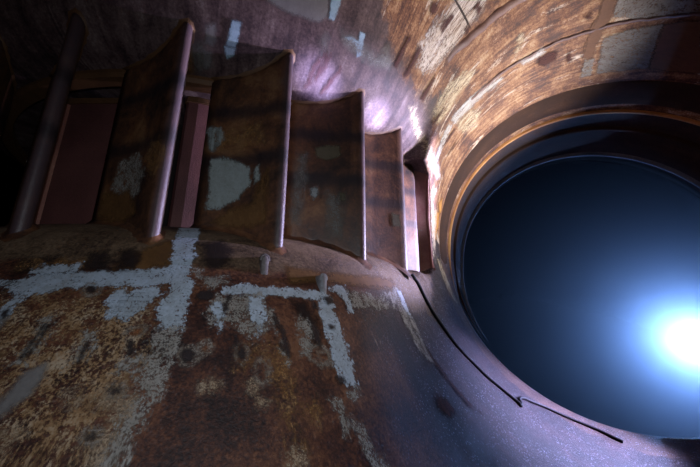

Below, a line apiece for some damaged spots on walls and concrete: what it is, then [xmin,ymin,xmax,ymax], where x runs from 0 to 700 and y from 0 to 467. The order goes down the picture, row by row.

corrosion [395,36,422,77]
corrosion [538,52,558,67]
corrosion [581,0,618,77]
peeling [597,0,700,74]
peeling [111,152,145,198]
peeling [206,127,260,210]
corrosion [112,240,176,271]
corrosion [285,266,396,289]
corrosion [0,286,159,467]
peeling [0,228,433,467]
corrosion [233,308,321,467]
corrosion [292,300,321,346]